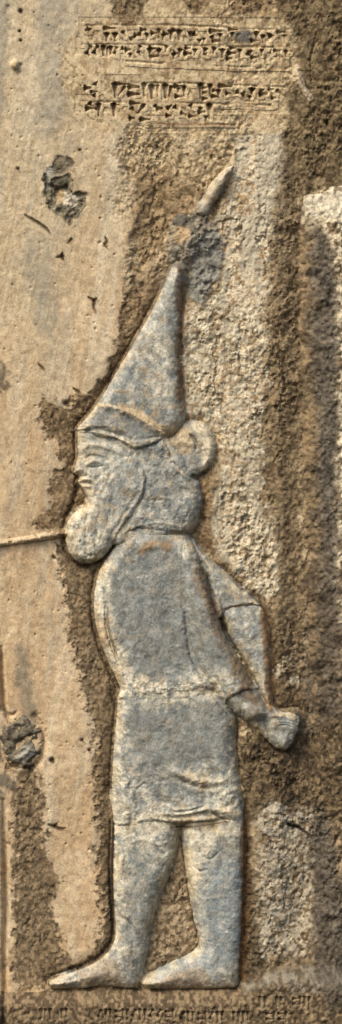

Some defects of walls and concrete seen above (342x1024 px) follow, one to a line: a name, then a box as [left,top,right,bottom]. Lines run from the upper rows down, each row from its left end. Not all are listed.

spalling [43,149,88,224]